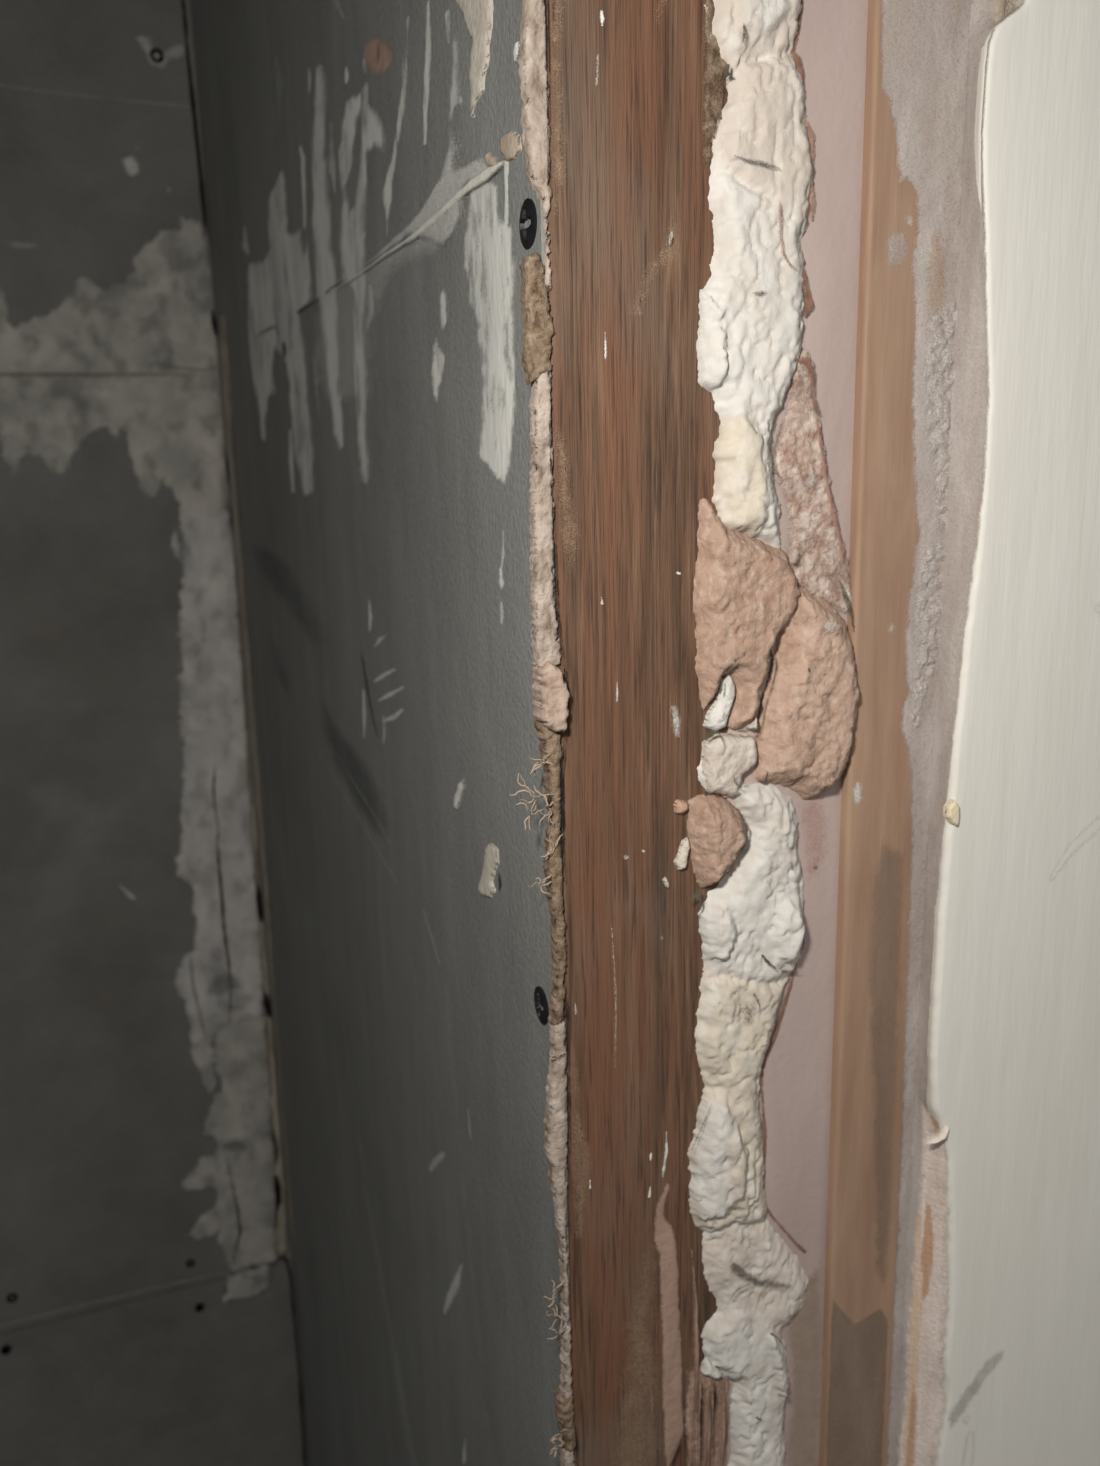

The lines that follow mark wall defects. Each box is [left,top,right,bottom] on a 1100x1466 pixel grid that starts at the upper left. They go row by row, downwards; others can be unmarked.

peeling [455,0,494,119]
peeling [791,0,804,83]
peeling [805,121,815,220]
peeling [778,203,814,317]
peeling [795,356,844,561]
spalling [500,0,577,1466]
peeling [826,0,1024,1466]
peeling [453,777,466,809]
peeling [477,843,502,898]
peeling [760,945,807,1254]
spalling [699,1382,717,1466]